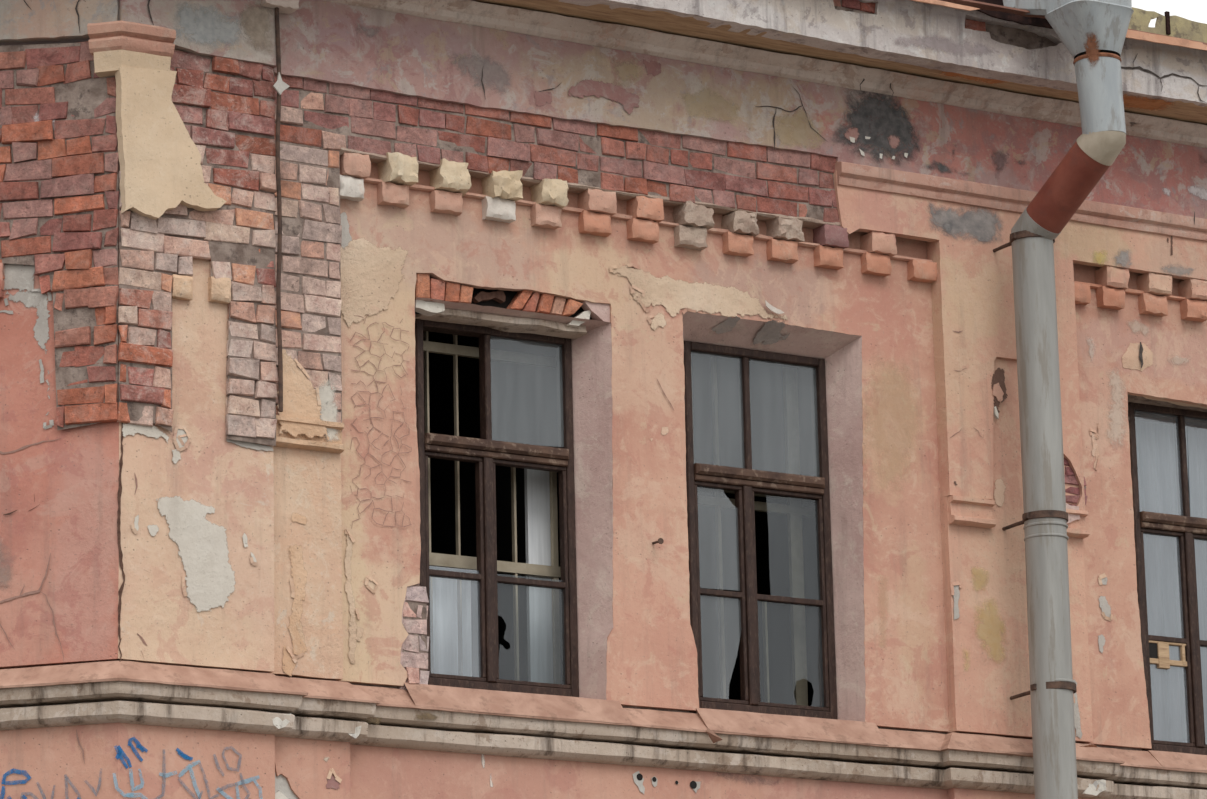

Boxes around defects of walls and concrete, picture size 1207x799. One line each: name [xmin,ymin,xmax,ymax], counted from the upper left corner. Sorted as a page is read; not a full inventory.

crack [1121,55,1206,103]
crack [755,87,825,149]
flaking render [0,42,840,464]
spalling [991,367,1008,419]
spalling [1064,423,1101,524]
peeling [131,496,236,612]
spalling [275,773,298,799]
spalling [324,757,342,789]